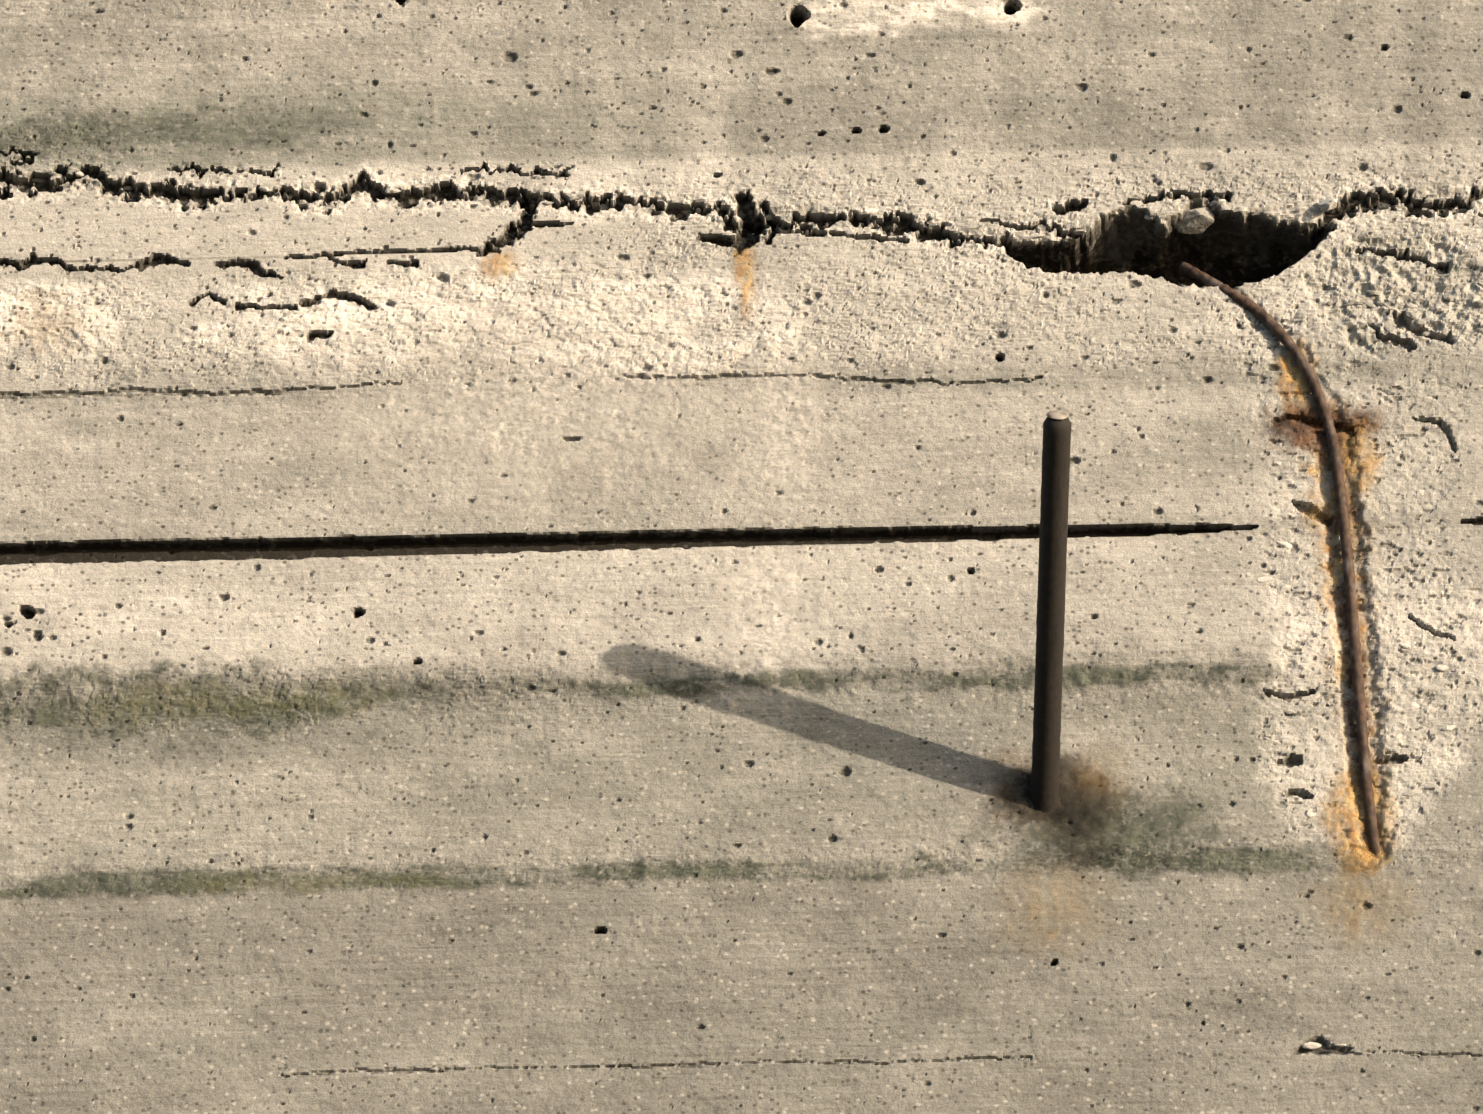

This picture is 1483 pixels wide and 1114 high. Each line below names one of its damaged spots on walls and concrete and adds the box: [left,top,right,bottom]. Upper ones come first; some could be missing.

crack [0,145,1235,342]
peeling [1112,200,1156,220]
crack [1316,179,1483,275]
crack [0,380,403,401]
crack [622,371,1046,388]
spalling [1206,227,1483,870]
corrosion [1272,350,1387,863]
corrosion [998,759,1105,856]